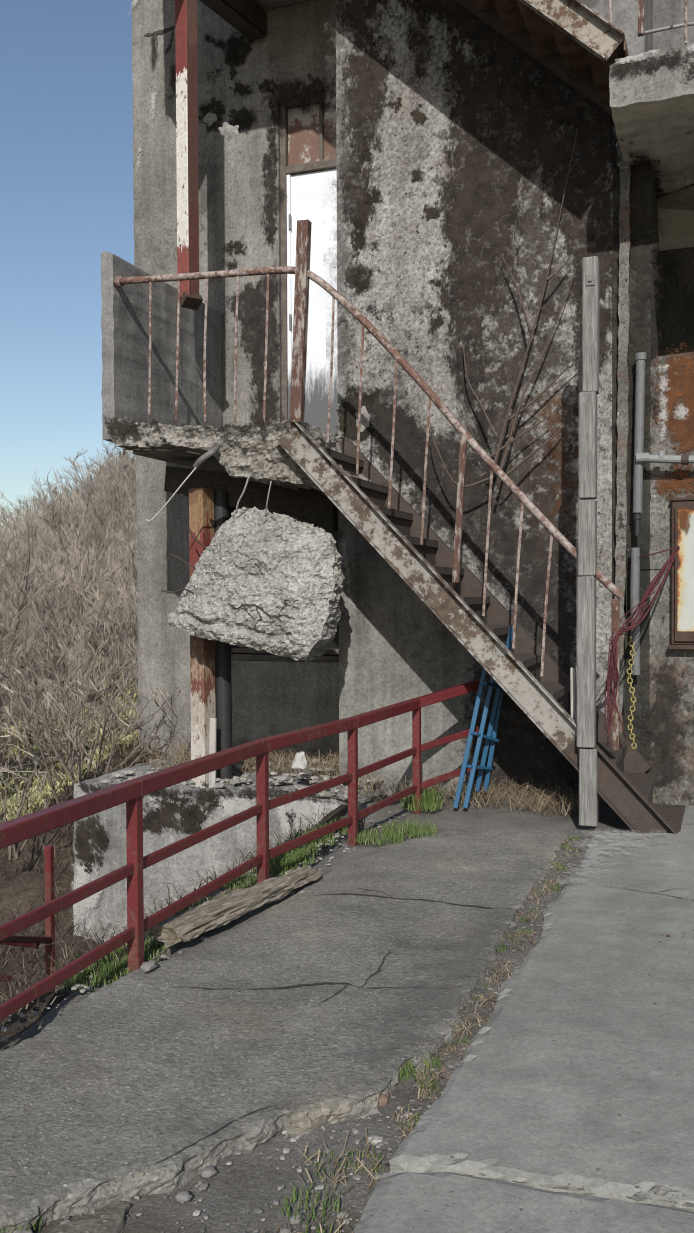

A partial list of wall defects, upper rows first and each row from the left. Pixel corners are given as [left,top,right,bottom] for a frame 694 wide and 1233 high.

water stain [198,0,694,685]
rust [518,380,579,538]
rust [648,343,694,533]
crack [311,888,520,910]
crack [175,949,434,1004]
crack [450,1156,585,1191]
crack [626,1185,694,1208]